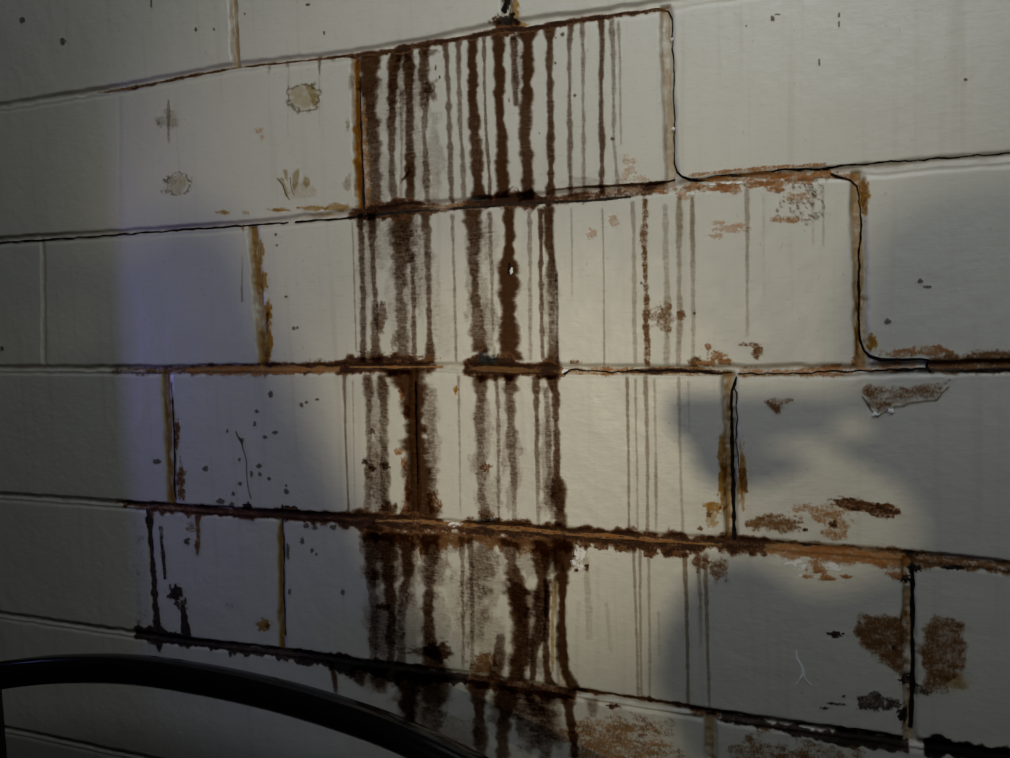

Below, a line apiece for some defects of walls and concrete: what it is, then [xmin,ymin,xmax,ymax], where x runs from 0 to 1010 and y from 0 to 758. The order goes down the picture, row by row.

crack [501,0,512,15]
rust [829,173,870,213]
crack [563,8,1010,540]
rust [742,322,1010,378]
rust [112,0,825,758]
rust [840,544,1010,583]